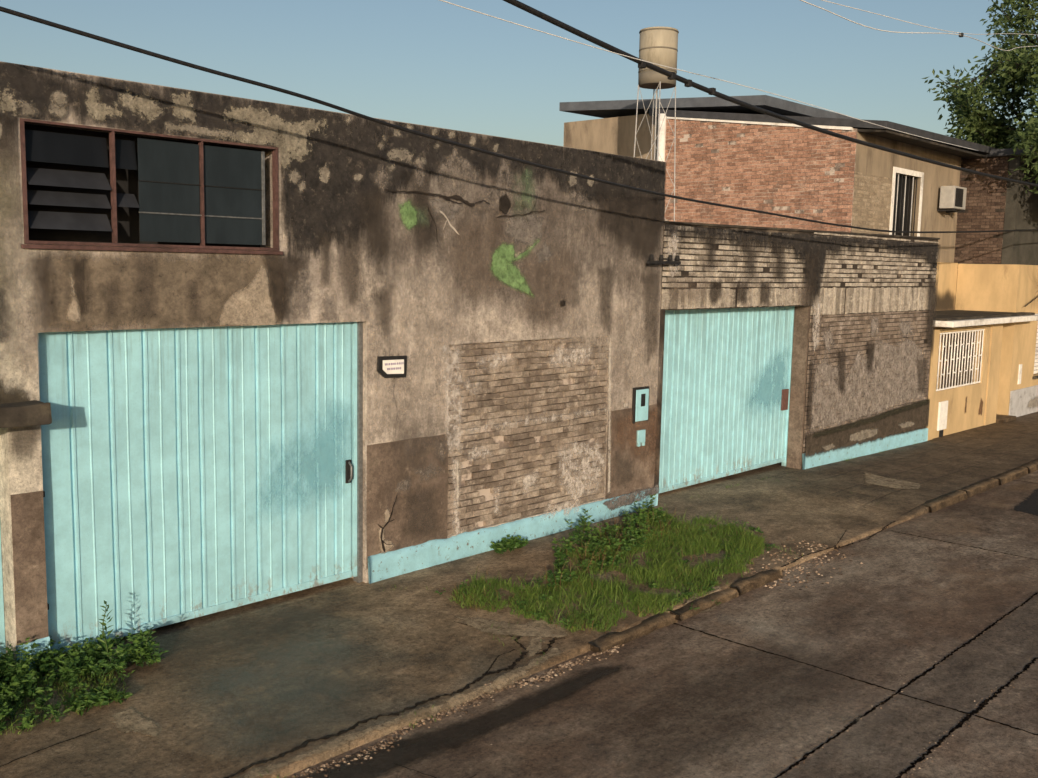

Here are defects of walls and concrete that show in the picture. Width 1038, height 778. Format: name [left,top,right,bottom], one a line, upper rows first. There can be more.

crack [383,189,545,241]
damp [0,62,954,533]
crack [378,496,397,552]